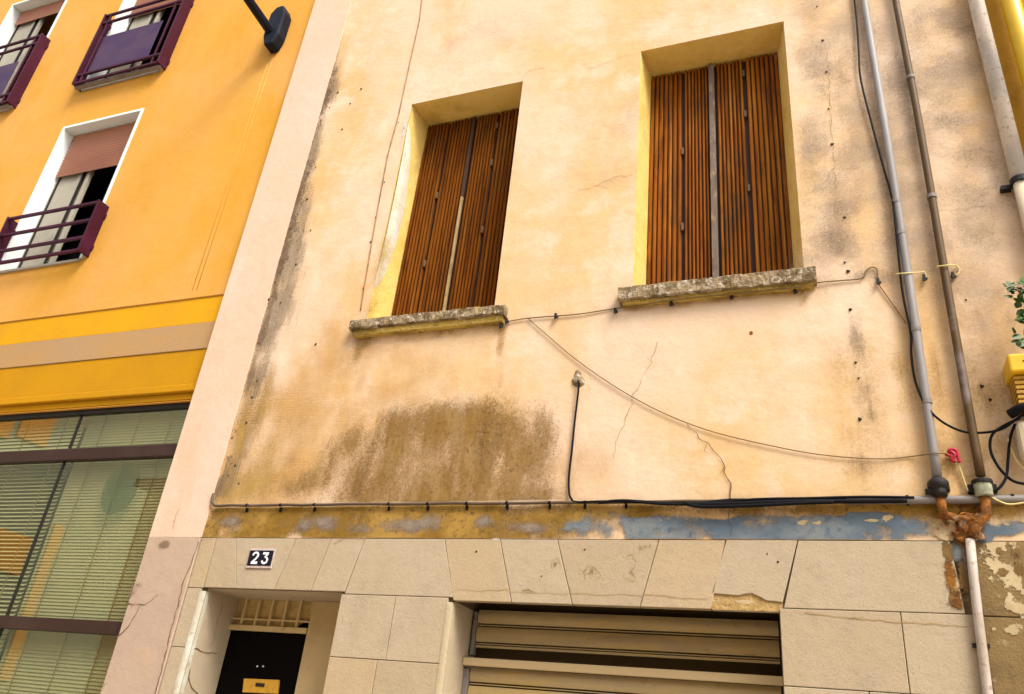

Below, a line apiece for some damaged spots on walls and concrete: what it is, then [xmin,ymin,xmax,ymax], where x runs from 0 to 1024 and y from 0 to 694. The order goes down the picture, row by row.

crack [613,345,657,458]
damp [202,401,978,538]
crack [687,424,733,537]
peeling [564,512,1024,619]
rust [944,561,963,609]
rust [936,504,989,543]
damp [991,503,1024,519]